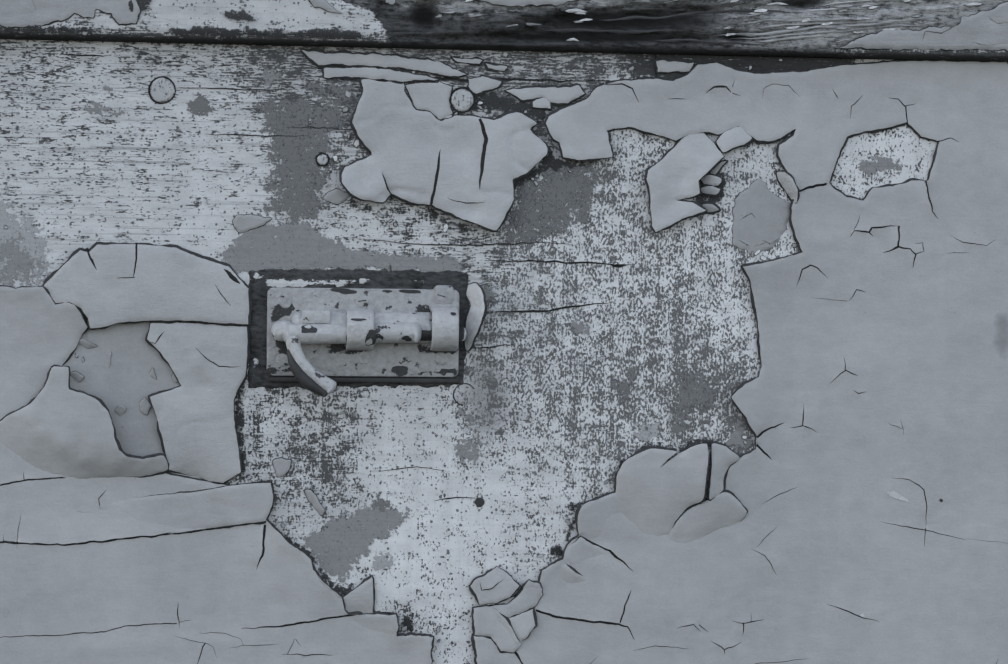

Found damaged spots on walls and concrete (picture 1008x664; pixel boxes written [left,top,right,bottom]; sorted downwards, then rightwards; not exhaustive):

peeling [435,0,484,18]
peeling [785,4,878,42]
peeling [830,125,937,199]
crack [365,239,632,268]
crack [851,220,924,265]
crack [488,303,607,313]
peeling [0,39,839,664]
crack [0,473,64,486]
crack [0,517,214,546]
crack [240,523,266,567]
crack [536,538,760,653]
crack [0,607,357,664]